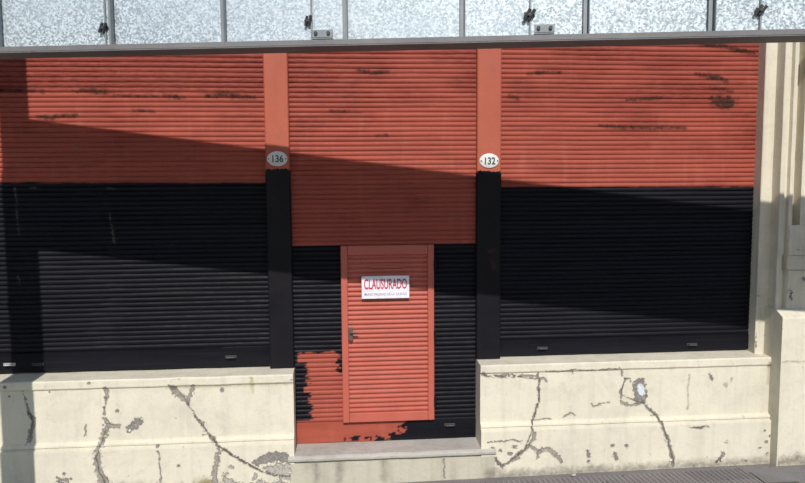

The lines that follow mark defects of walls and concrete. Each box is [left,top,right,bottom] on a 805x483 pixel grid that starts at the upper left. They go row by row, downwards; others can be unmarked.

crack [23,394,36,446]
crack [84,387,121,483]
flaking render [126,416,143,433]
crack [168,384,290,483]
flaking render [250,451,292,483]
crack [481,367,675,468]